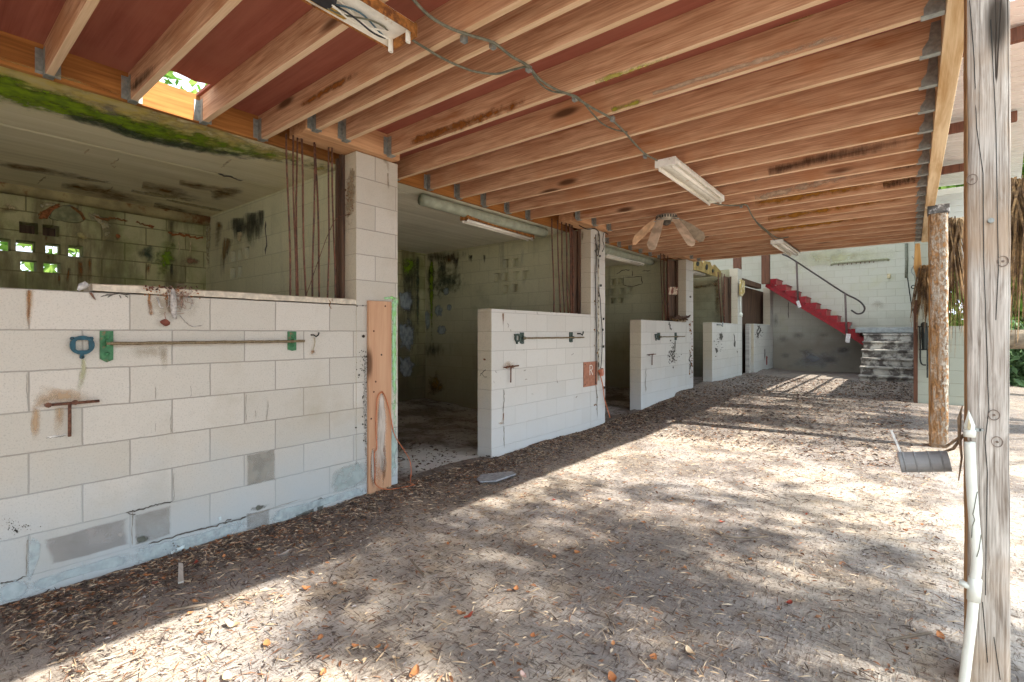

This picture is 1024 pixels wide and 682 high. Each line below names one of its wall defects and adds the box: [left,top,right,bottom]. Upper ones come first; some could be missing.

damp [233,210,267,255]
damp [399,253,485,377]